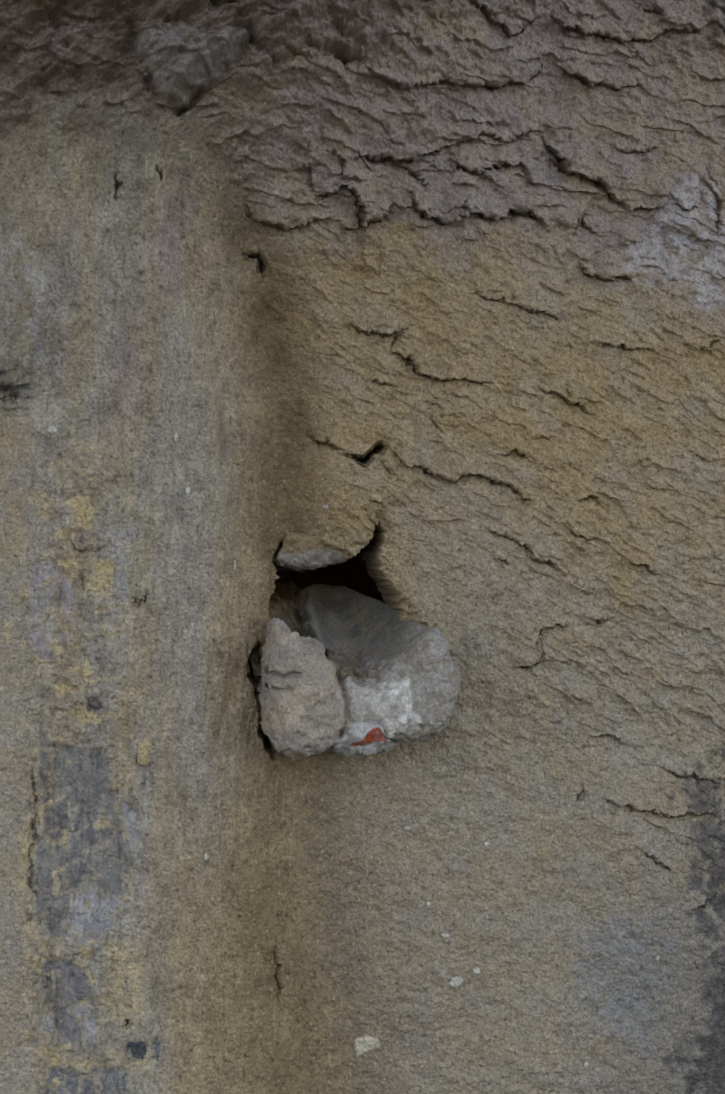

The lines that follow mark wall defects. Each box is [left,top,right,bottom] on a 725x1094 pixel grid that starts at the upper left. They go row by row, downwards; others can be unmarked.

crack [579,262,633,282]
crack [516,305,560,321]
crack [604,343,653,351]
crack [345,324,454,434]
crack [540,383,588,414]
crack [306,431,346,454]
crack [382,449,534,505]
crack [485,528,559,572]
spalling [224,161,725,1094]
crack [521,617,613,670]
crack [669,771,708,781]
crack [578,786,718,819]